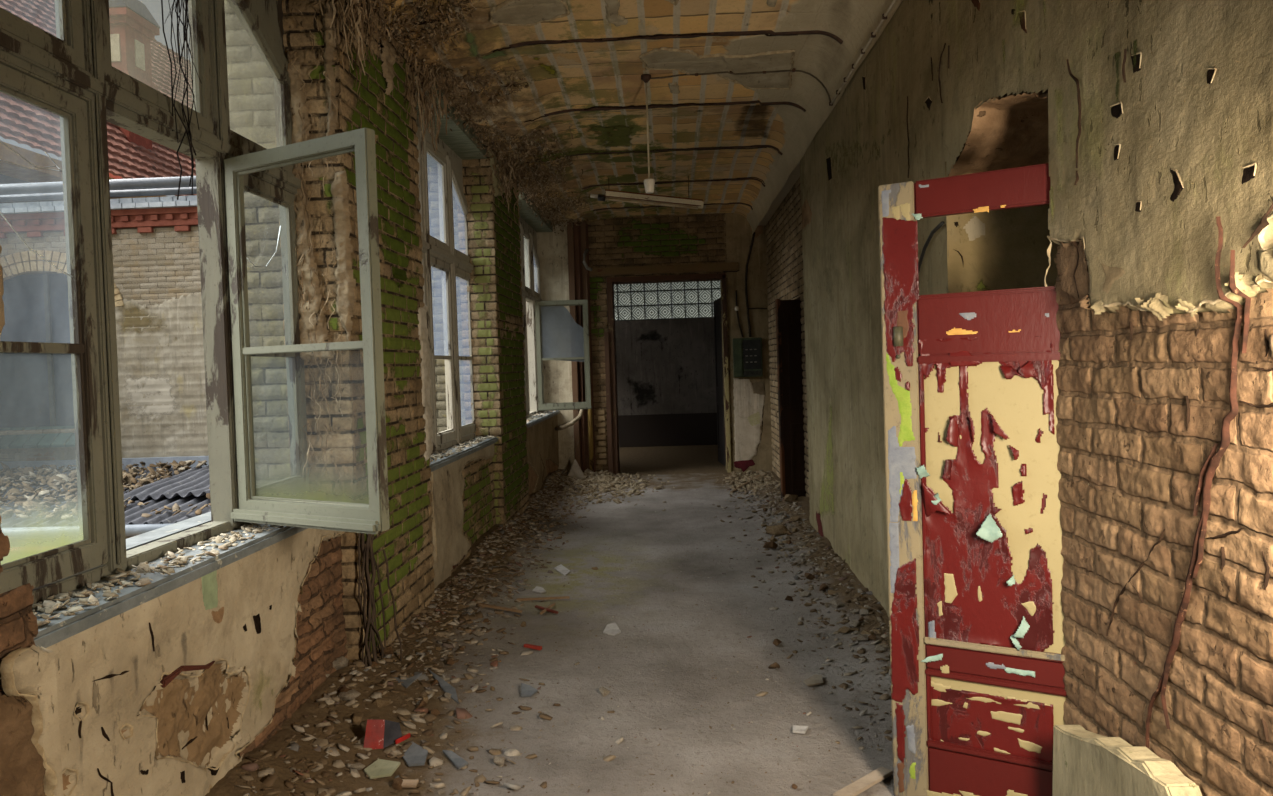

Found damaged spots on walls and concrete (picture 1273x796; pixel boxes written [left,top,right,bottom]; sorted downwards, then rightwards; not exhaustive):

flaking render [136,531,348,793]
peeling [734,459,755,472]
flaking render [881,189,1273,796]
crack [1106,529,1165,636]
crack [1146,203,1273,749]